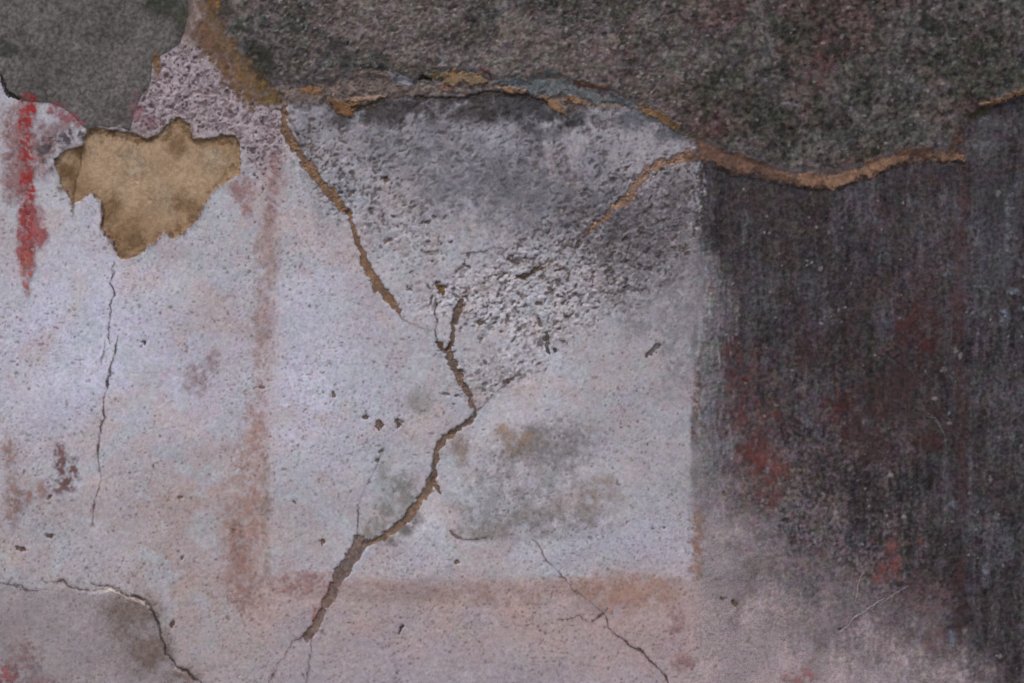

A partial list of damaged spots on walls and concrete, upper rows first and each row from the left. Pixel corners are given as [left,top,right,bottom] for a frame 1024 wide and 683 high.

spalling [36,46,620,259]
crack [279,94,410,323]
crack [420,248,503,274]
leakage [329,93,595,138]
spalling [408,168,700,354]
spalling [638,104,706,141]
crack [514,90,1024,279]
crack [97,263,118,456]
spalling [435,350,514,405]
crack [268,298,525,682]
crack [3,579,202,683]
crack [533,540,669,683]